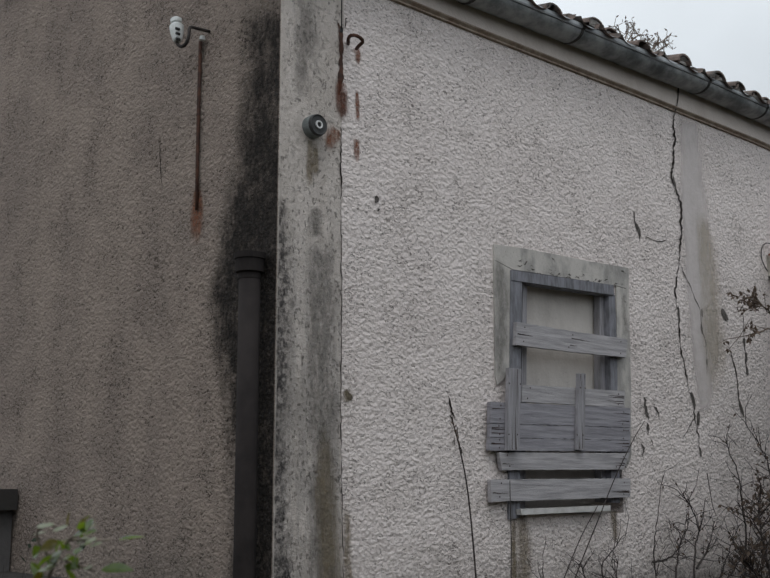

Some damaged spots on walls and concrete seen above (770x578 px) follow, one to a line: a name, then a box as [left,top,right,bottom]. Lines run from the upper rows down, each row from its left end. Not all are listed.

corrosion [336,18,359,118]
water stain [213,13,291,578]
crack [633,88,708,457]
crack [731,317,749,417]